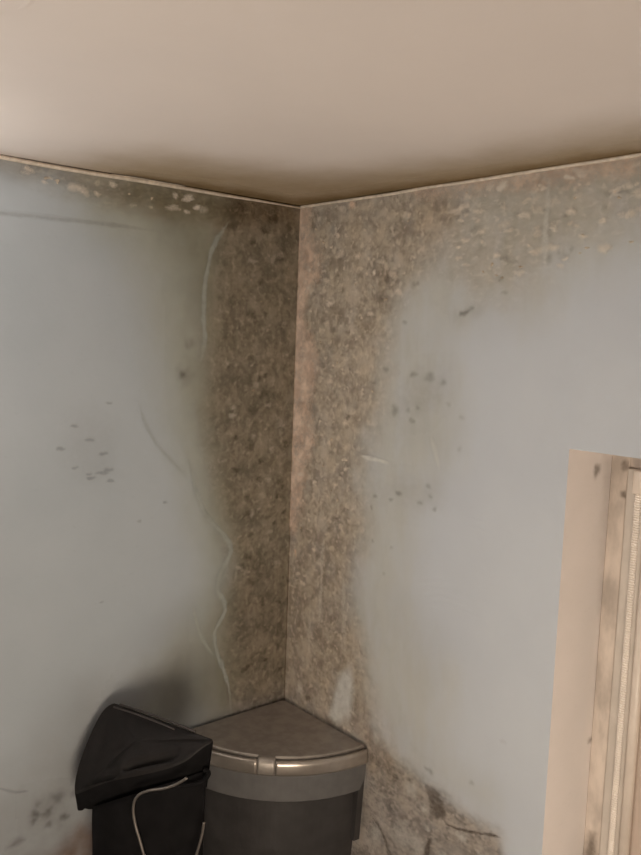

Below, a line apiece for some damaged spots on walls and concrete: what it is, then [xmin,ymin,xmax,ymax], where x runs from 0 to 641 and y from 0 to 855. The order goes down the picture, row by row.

leakage [400,152,641,268]
leakage [370,780,495,855]